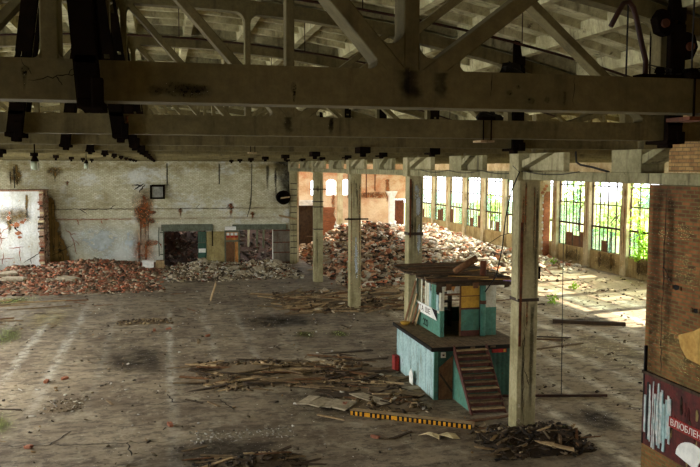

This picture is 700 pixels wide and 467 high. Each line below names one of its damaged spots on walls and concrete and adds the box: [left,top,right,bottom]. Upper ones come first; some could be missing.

spalling [6,211,27,239]
rust [135,195,157,261]
rust [522,183,535,242]